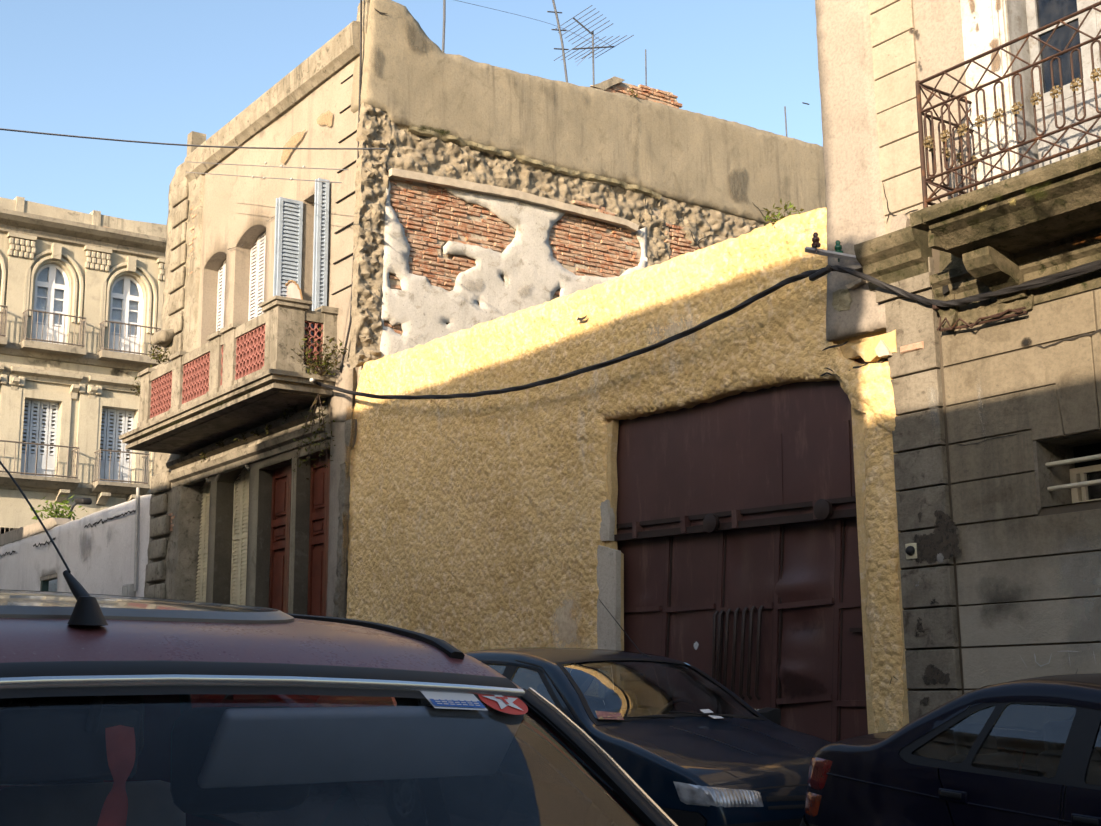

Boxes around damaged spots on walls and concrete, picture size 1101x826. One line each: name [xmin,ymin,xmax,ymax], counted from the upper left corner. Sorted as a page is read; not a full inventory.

leakage [407,22,426,51]
peeling [990,38,1000,72]
leakage [729,169,747,200]
flaking render [349,102,767,369]
flaking render [850,329,924,362]